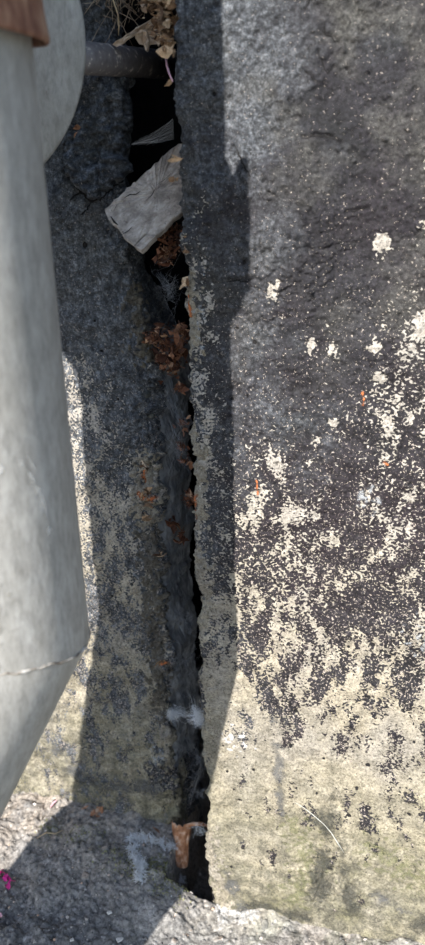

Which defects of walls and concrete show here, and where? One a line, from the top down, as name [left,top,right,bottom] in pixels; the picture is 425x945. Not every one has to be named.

crack [122,0,178,51]
crack [64,78,183,215]
crack [144,216,191,340]
crack [188,399,203,661]
water stain [274,758,284,816]
water stain [312,811,337,836]
water stain [216,872,312,925]
water stain [308,843,361,914]